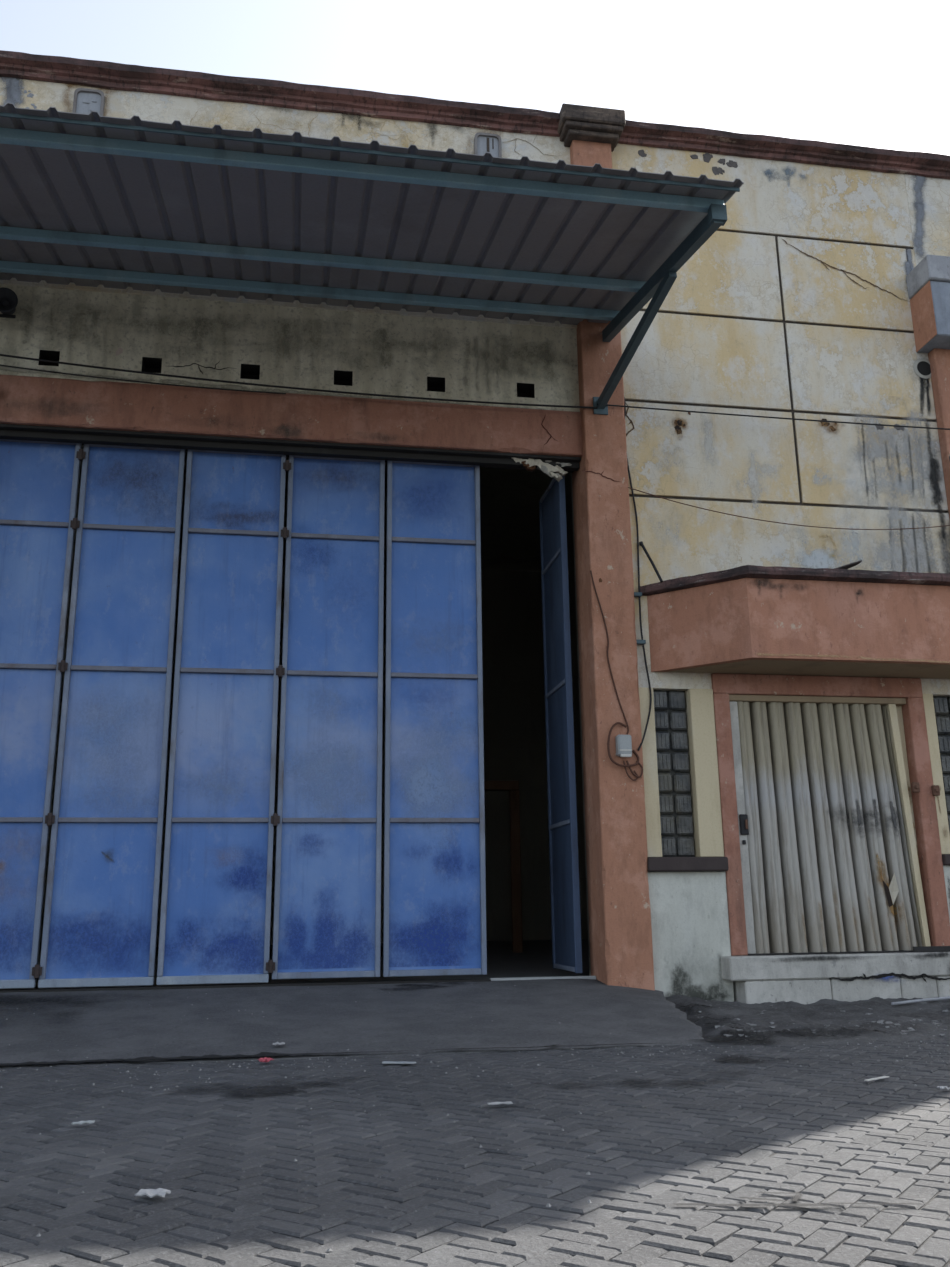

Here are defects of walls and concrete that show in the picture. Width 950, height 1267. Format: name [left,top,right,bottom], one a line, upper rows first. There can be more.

damp [0,77,23,106]
spalling [690,152,738,175]
damp [905,175,926,289]
crack [782,239,907,301]
spalling [512,457,572,482]
damp [856,377,950,573]